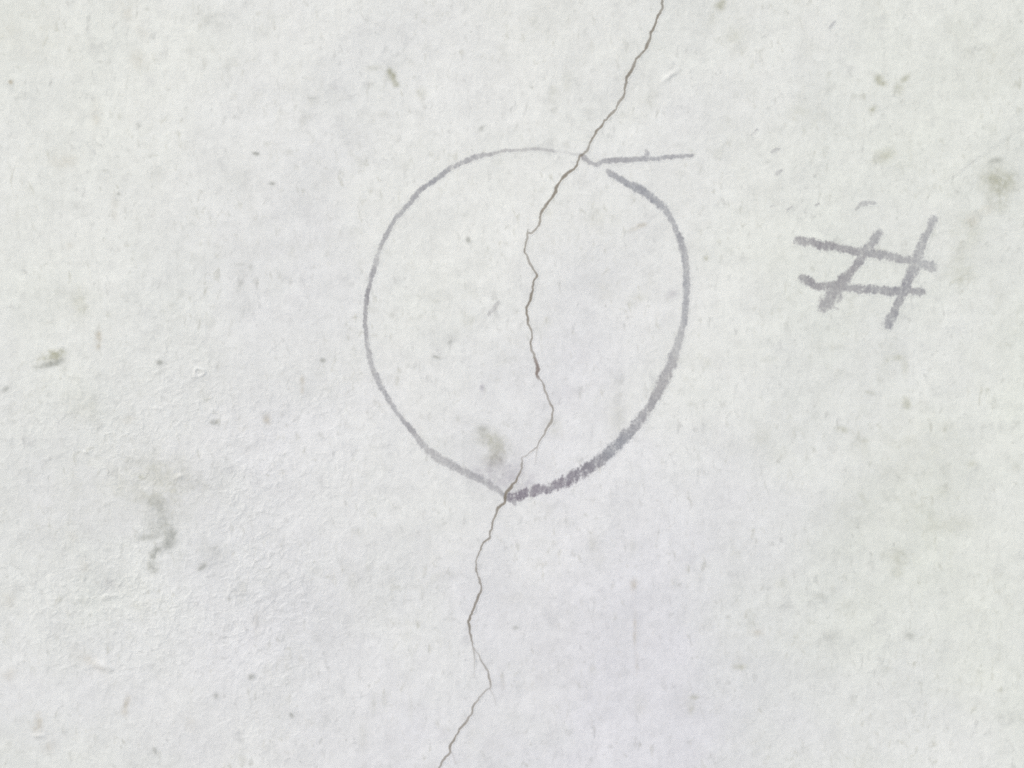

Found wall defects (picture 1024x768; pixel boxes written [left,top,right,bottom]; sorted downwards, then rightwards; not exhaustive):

crack [437,0,665,768]